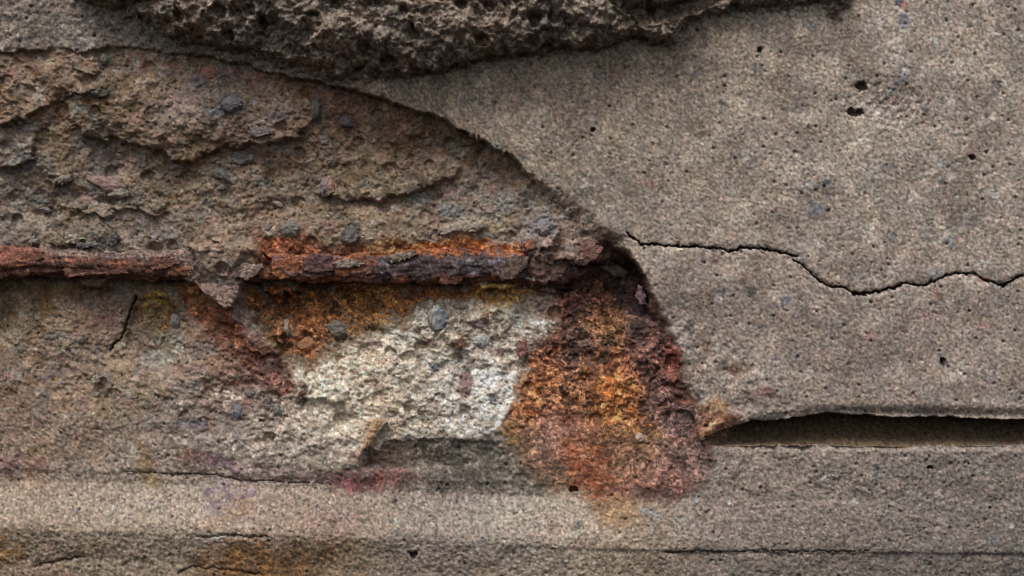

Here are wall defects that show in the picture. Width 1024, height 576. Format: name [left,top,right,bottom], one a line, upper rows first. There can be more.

spalling [0,46,656,470]
corrosion [137,233,734,525]
crack [627,232,1024,296]